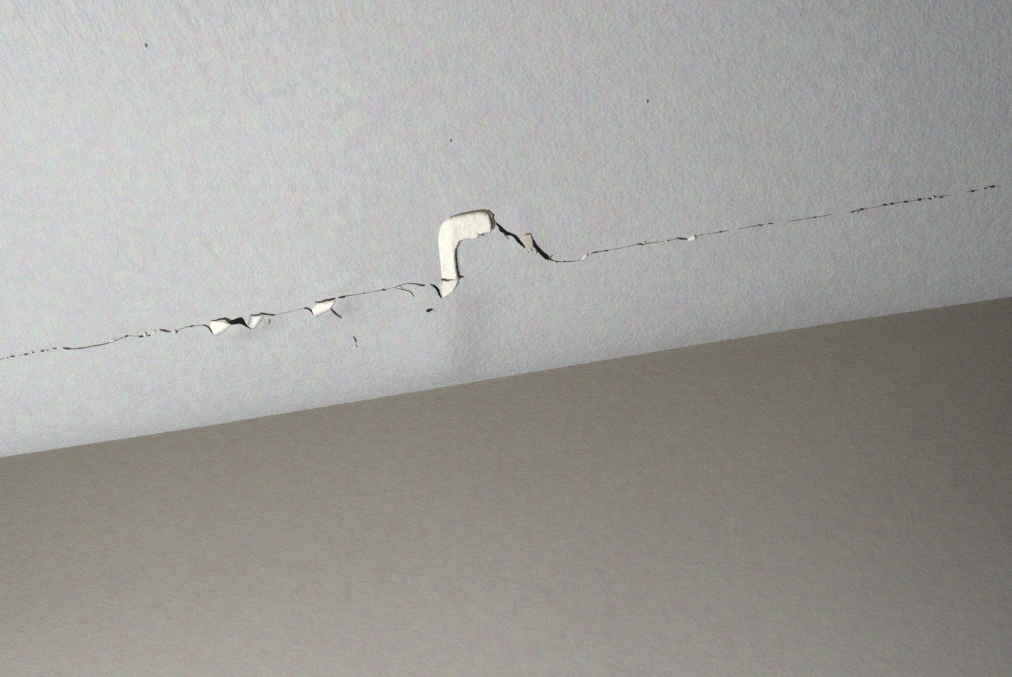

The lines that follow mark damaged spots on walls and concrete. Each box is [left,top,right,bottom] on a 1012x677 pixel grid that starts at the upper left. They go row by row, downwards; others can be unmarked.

peeling [381,136,603,301]
crack [495,185,1001,263]
crack [0,325,203,360]
peeling [187,259,388,353]
crack [345,268,484,317]